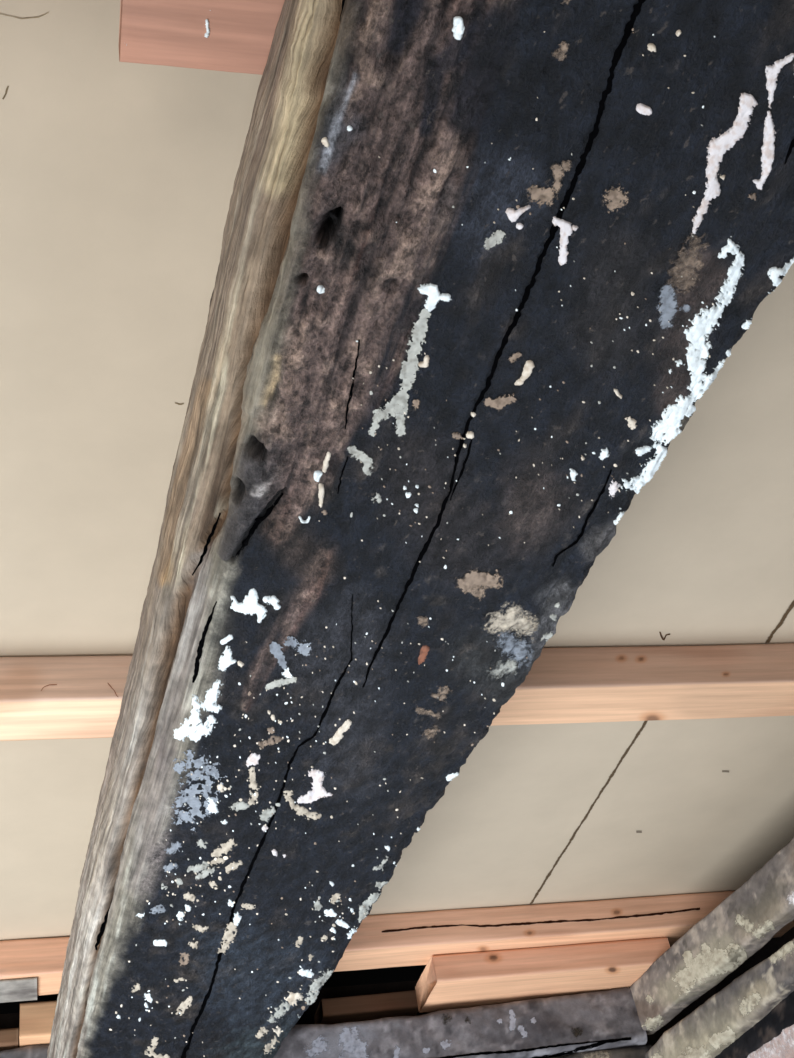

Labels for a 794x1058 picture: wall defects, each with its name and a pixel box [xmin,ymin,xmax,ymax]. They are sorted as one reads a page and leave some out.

water stain [368,399,420,437]
water stain [318,452,331,515]
crack [181,0,646,1058]
crack [766,601,794,643]
water stain [284,636,312,656]
water stain [265,668,297,690]
water stain [248,767,260,805]
crack [382,721,700,933]
water stain [228,899,256,926]
water stain [497,1009,536,1038]
water stain [422,1039,452,1054]